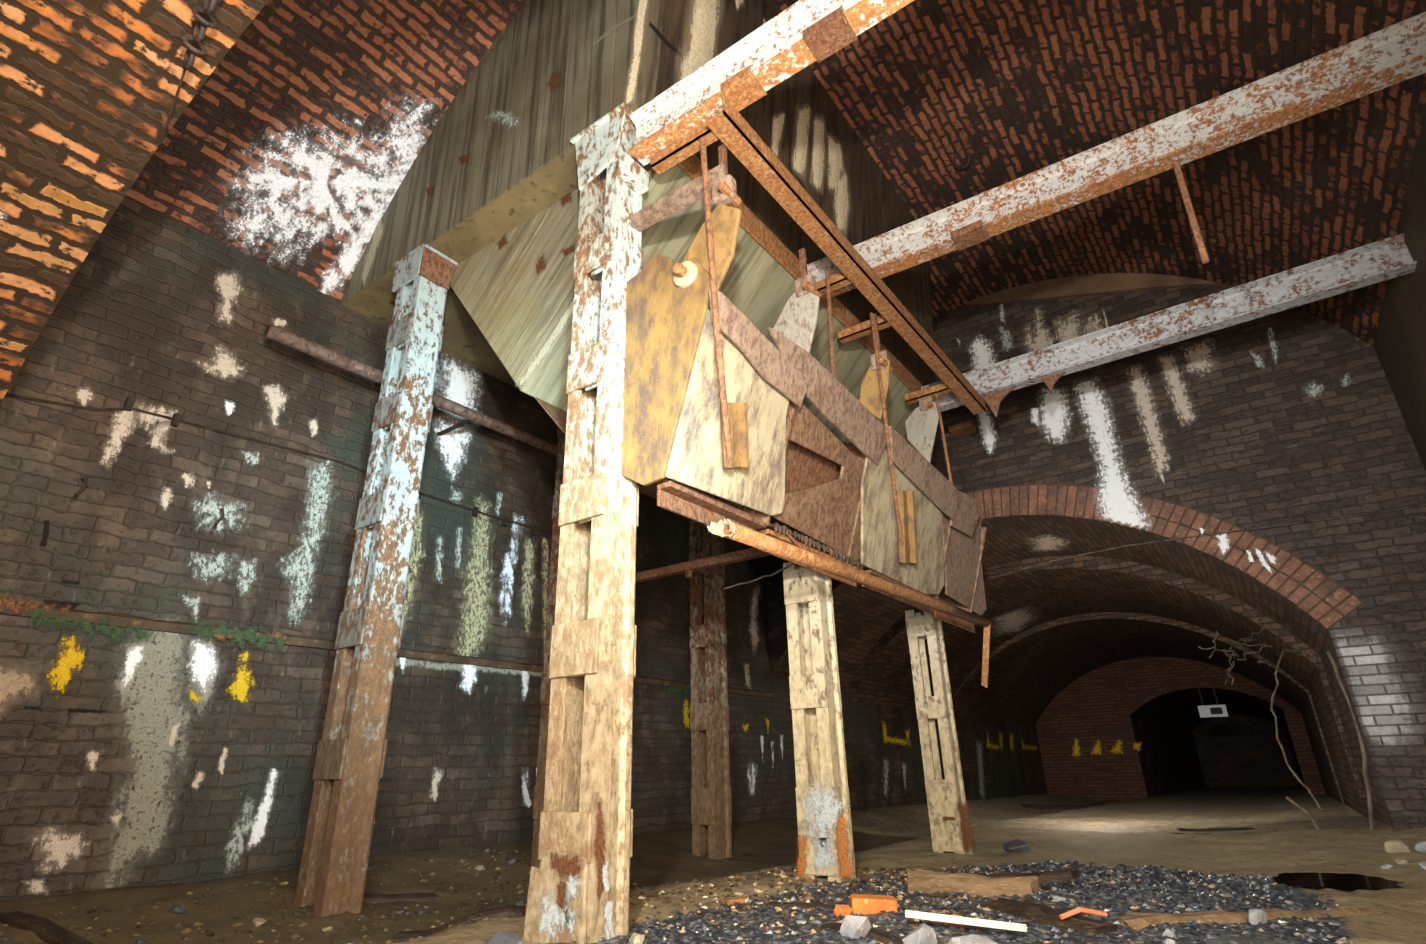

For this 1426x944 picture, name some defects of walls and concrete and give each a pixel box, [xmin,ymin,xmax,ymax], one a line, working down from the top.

damp [225,96,437,294]
damp [101,402,177,467]
damp [160,473,248,532]
damp [198,344,247,379]
damp [215,274,243,324]
damp [263,385,287,426]
damp [280,460,335,625]
damp [395,354,549,700]
damp [1031,379,1151,528]
damp [1125,339,1216,484]
damp [27,551,257,894]
rust [551,801,605,909]